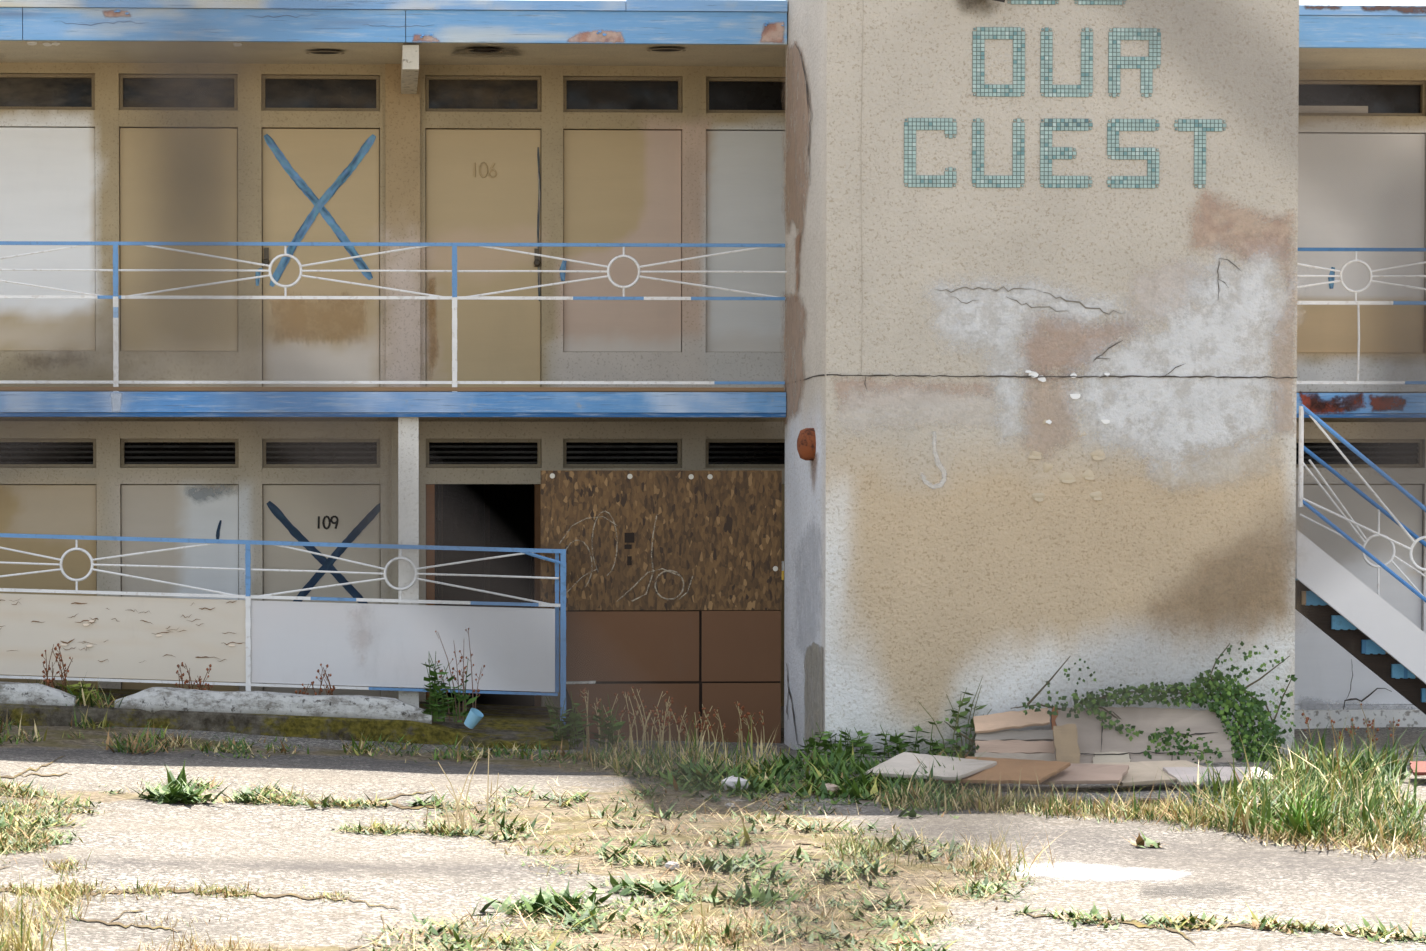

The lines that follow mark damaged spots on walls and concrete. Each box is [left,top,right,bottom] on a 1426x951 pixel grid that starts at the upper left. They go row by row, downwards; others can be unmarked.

peeling [569,31,624,43]
peeling [761,22,784,43]
crack [858,6,866,305]
crack [795,286,1297,392]
rust [1299,392,1387,413]